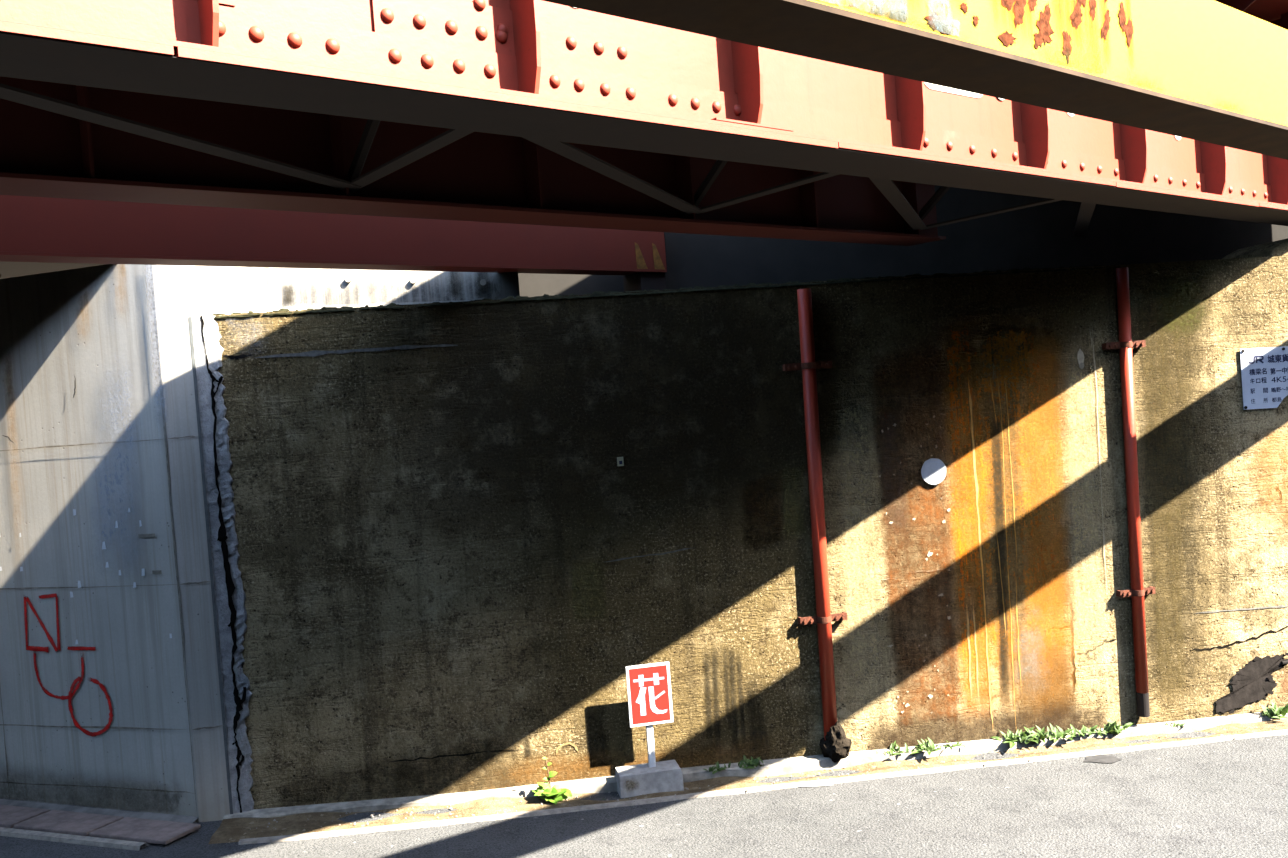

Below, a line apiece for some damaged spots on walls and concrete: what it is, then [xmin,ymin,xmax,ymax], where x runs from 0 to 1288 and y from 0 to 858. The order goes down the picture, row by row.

rust [925,12,953,33]
rust [998,0,1134,64]
rust [946,326,1072,711]
crack [200,316,252,813]
crack [1192,626,1288,651]
peeling [1215,652,1288,713]